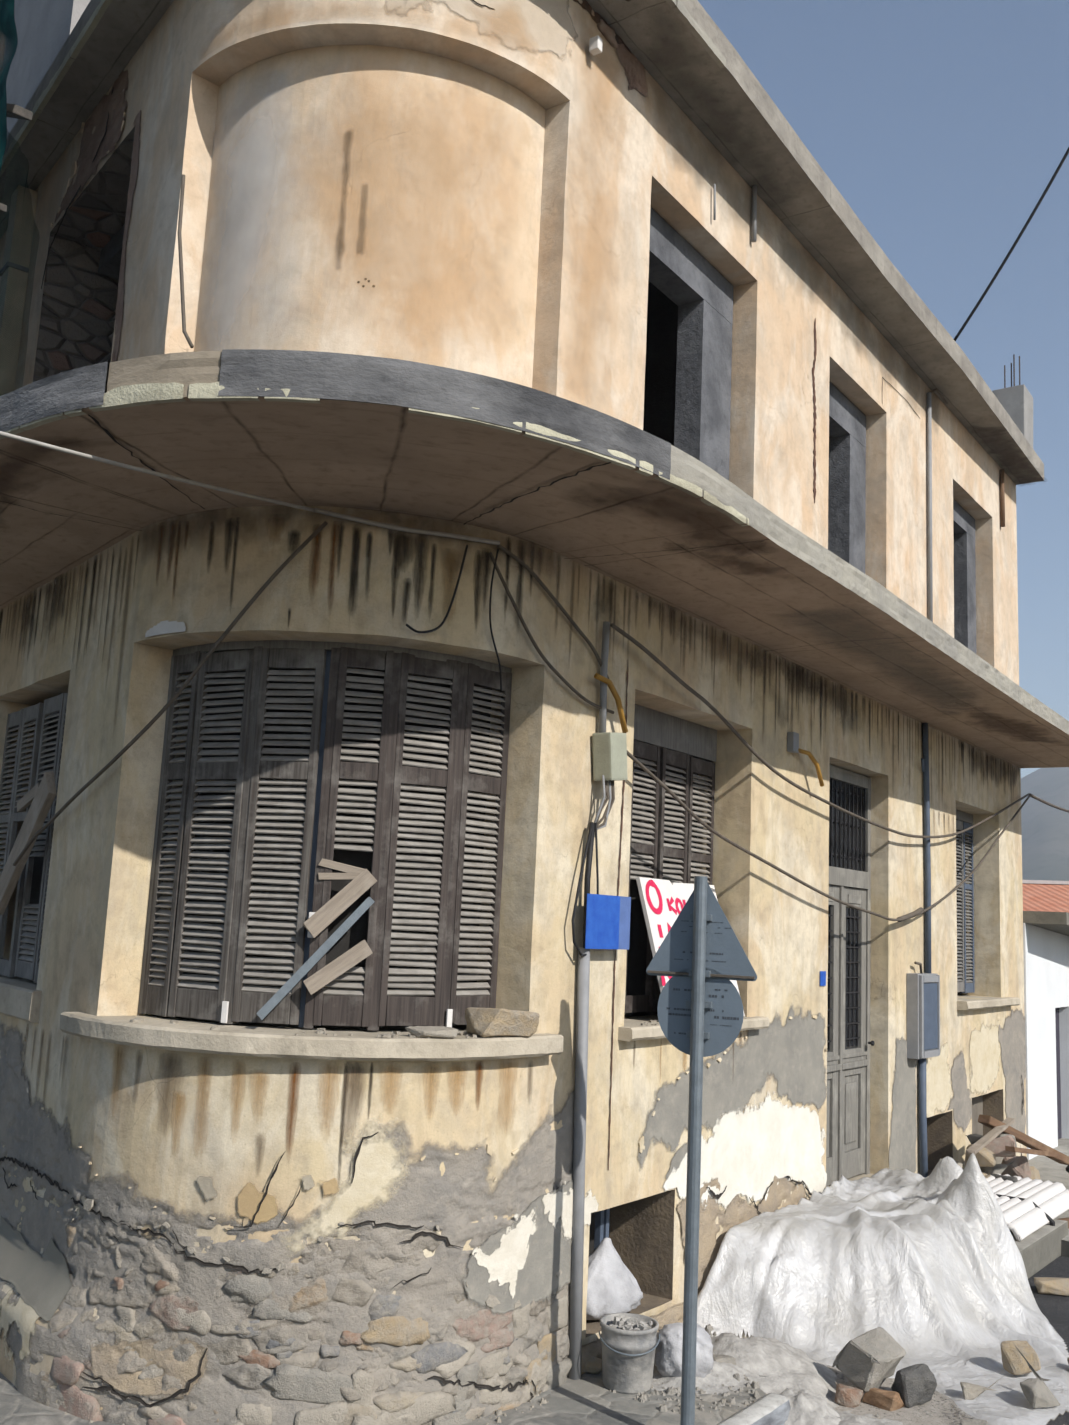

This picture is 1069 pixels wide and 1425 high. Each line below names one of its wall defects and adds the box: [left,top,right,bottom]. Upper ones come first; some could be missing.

peeling [385,0,648,97]
crack [810,318,818,503]
water stain [338,524,372,602]
water stain [389,531,452,618]
water stain [475,540,541,618]
crack [0,1156,276,1274]
crack [233,1152,303,1228]
peeling [0,1024,602,1425]
water stain [327,1065,393,1159]
crack [337,1220,463,1287]
peeling [638,1006,827,1292]
peeling [889,1009,1026,1173]